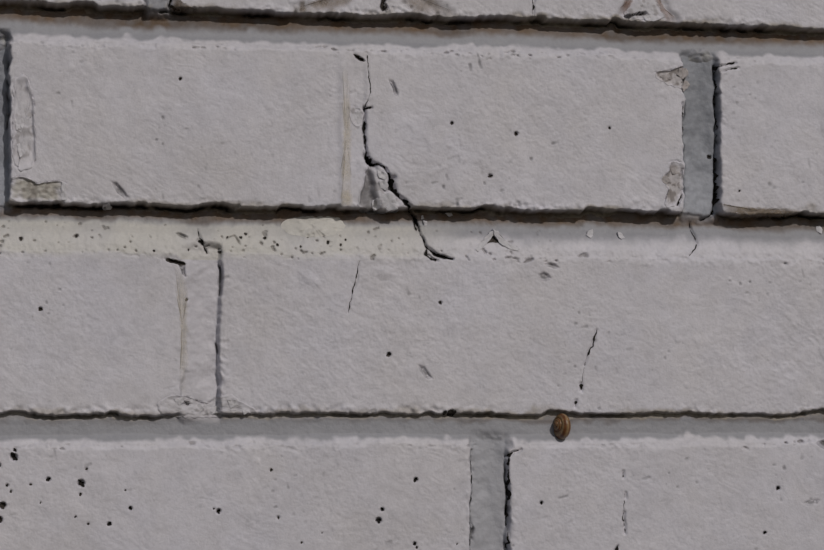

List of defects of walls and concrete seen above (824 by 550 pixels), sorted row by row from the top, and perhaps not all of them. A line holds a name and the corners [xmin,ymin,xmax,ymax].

spalling [655,65,690,92]
spalling [9,74,67,205]
spalling [357,158,404,214]
crack [362,55,453,261]
spalling [661,161,685,208]
crack [689,62,737,256]
crack [575,330,597,405]
crack [505,450,519,550]